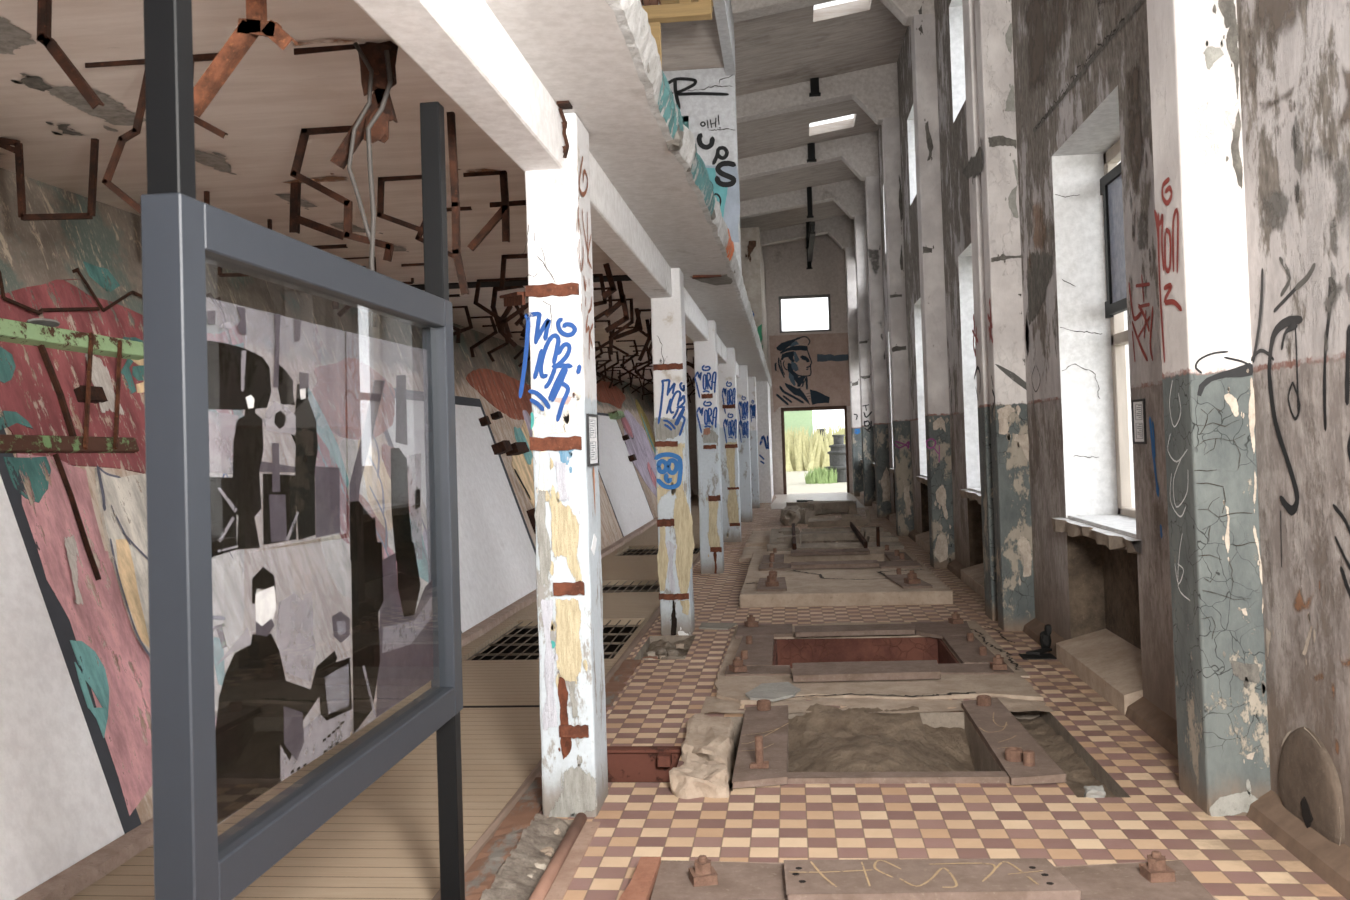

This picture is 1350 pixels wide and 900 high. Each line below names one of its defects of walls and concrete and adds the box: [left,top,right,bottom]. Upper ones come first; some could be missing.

spalling [0,16,36,55]
peeling [46,122,83,136]
spalling [11,73,146,132]
peeling [1203,0,1243,189]
spalling [962,136,1019,218]
peeling [991,250,1053,365]
peeling [997,405,1029,461]
peeling [532,380,597,817]
peeling [653,417,740,635]
peeling [934,485,952,562]
peeling [1017,536,1032,585]
crack [1194,407,1257,638]